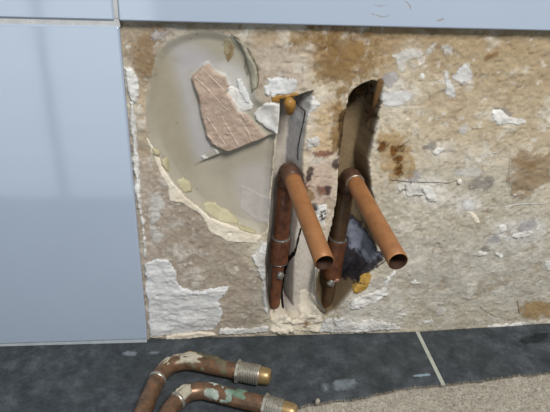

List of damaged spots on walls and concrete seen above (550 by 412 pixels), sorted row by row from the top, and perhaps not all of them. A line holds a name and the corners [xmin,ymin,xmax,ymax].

spalling [491,109,526,126]
spalling [145,30,280,314]
corrosion [377,140,410,176]
peeling [152,331,217,339]